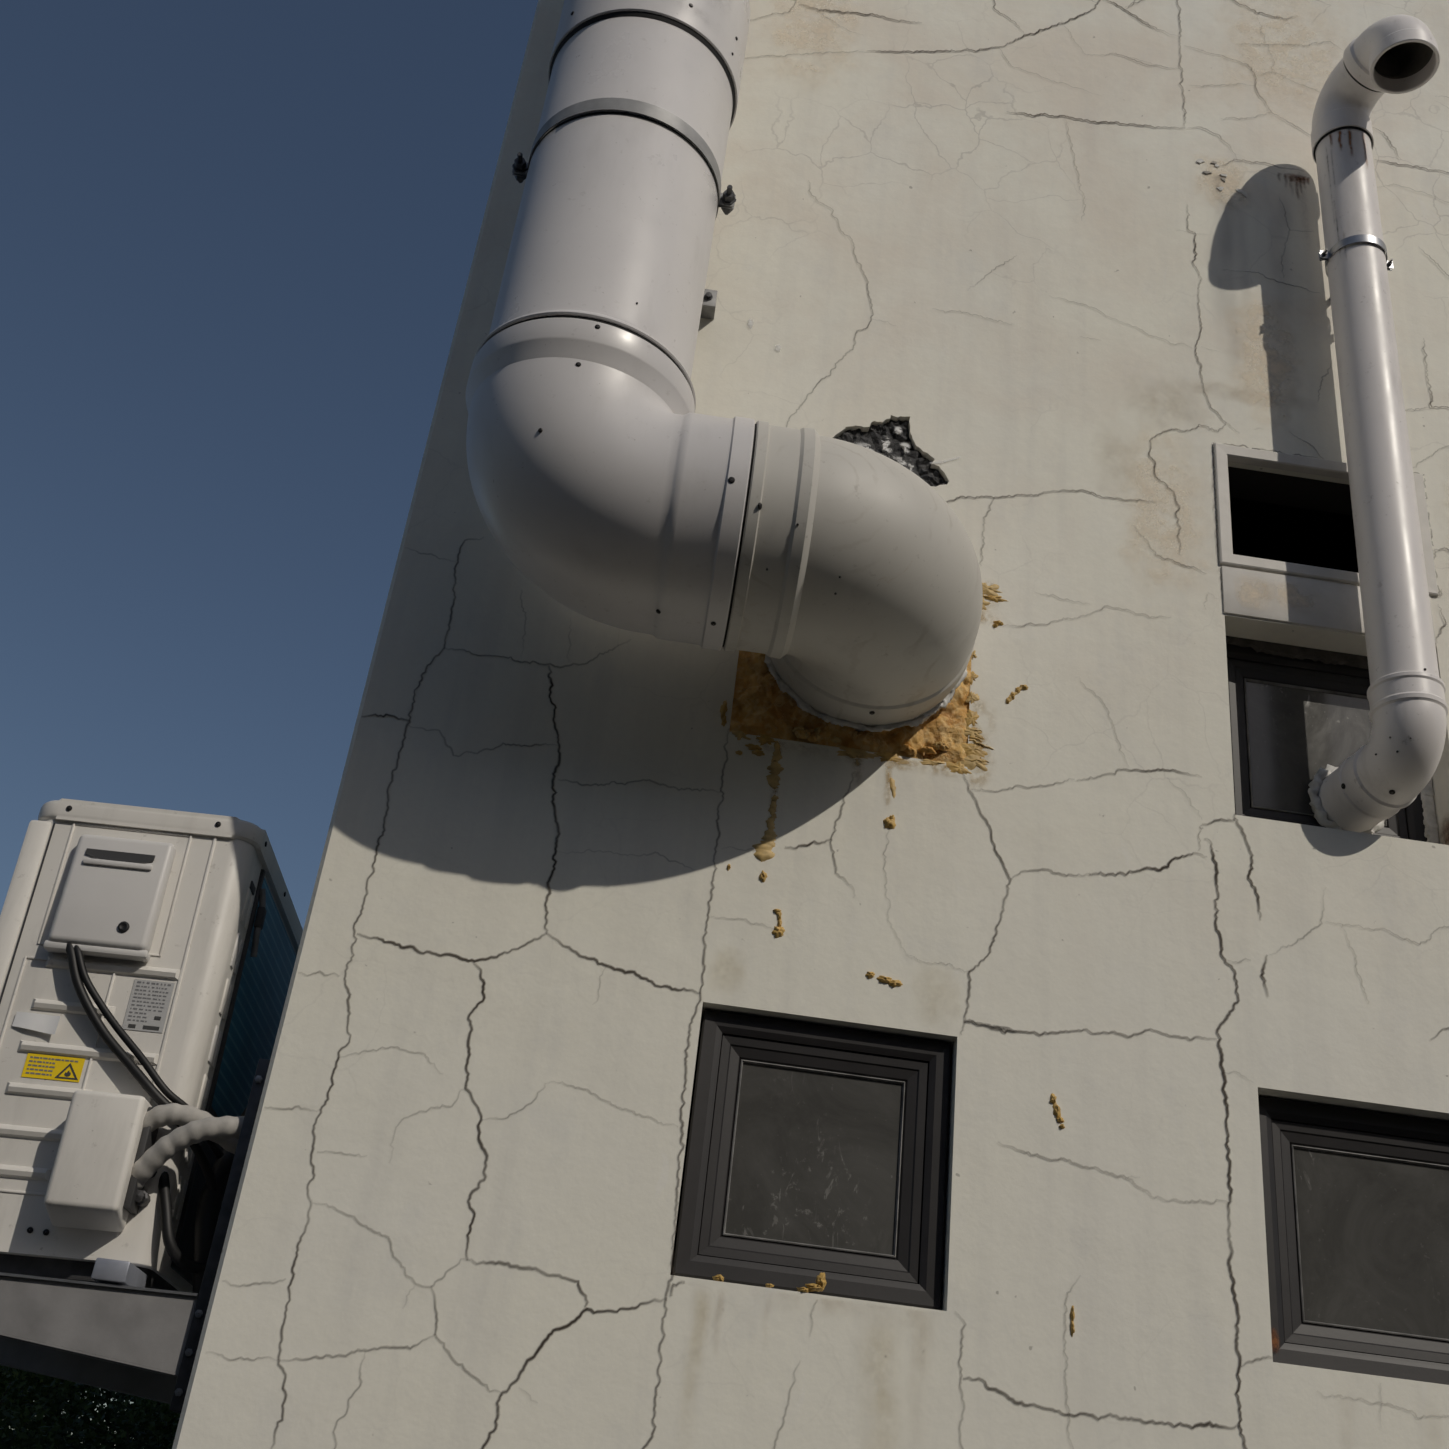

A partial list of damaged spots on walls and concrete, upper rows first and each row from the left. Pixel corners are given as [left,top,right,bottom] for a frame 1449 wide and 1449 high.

crack [808,0,1279,168]
crack [1384,134,1449,173]
spalling [836,420,947,487]
crack [947,494,1032,502]
crack [1067,309,1315,523]
crack [796,798,844,862]
crack [1119,766,1183,774]
crack [309,542,726,1449]
crack [959,788,1266,1449]
crack [276,1236,317,1429]